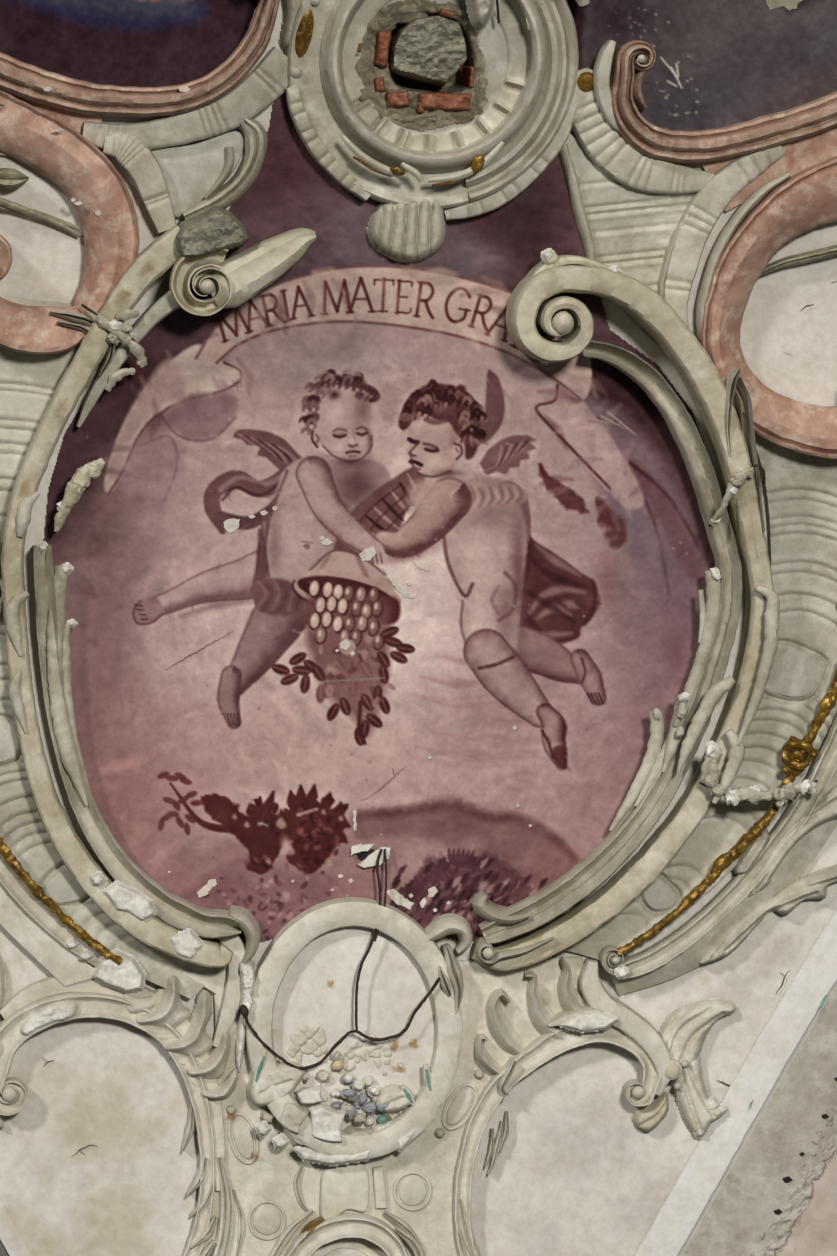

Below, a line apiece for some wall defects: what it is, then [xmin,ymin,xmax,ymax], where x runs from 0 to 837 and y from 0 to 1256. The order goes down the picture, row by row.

peeling [765,0,803,11]
spalling [355,0,488,131]
spalling [330,809,391,891]
spalling [89,871,157,921]
peeling [197,879,217,898]
peeling [387,886,451,912]
spalling [64,937,146,994]
spalling [170,928,205,959]
spalling [255,1050,408,1166]
spalling [750,1106,837,1256]